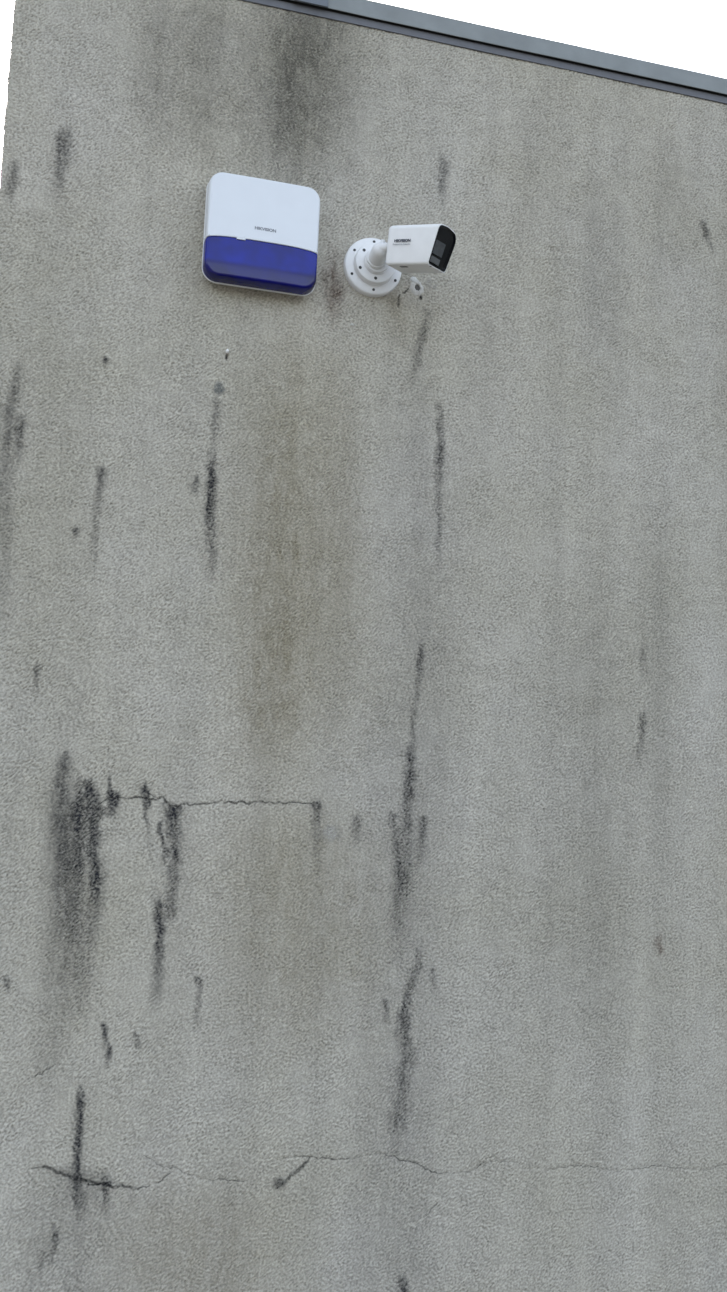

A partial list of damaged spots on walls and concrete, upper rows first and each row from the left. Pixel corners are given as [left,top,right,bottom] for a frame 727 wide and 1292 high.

water stain [195,464,216,530]
water stain [54,760,119,918]
water stain [158,806,178,864]
water stain [155,901,164,973]
water stain [74,1093,84,1191]